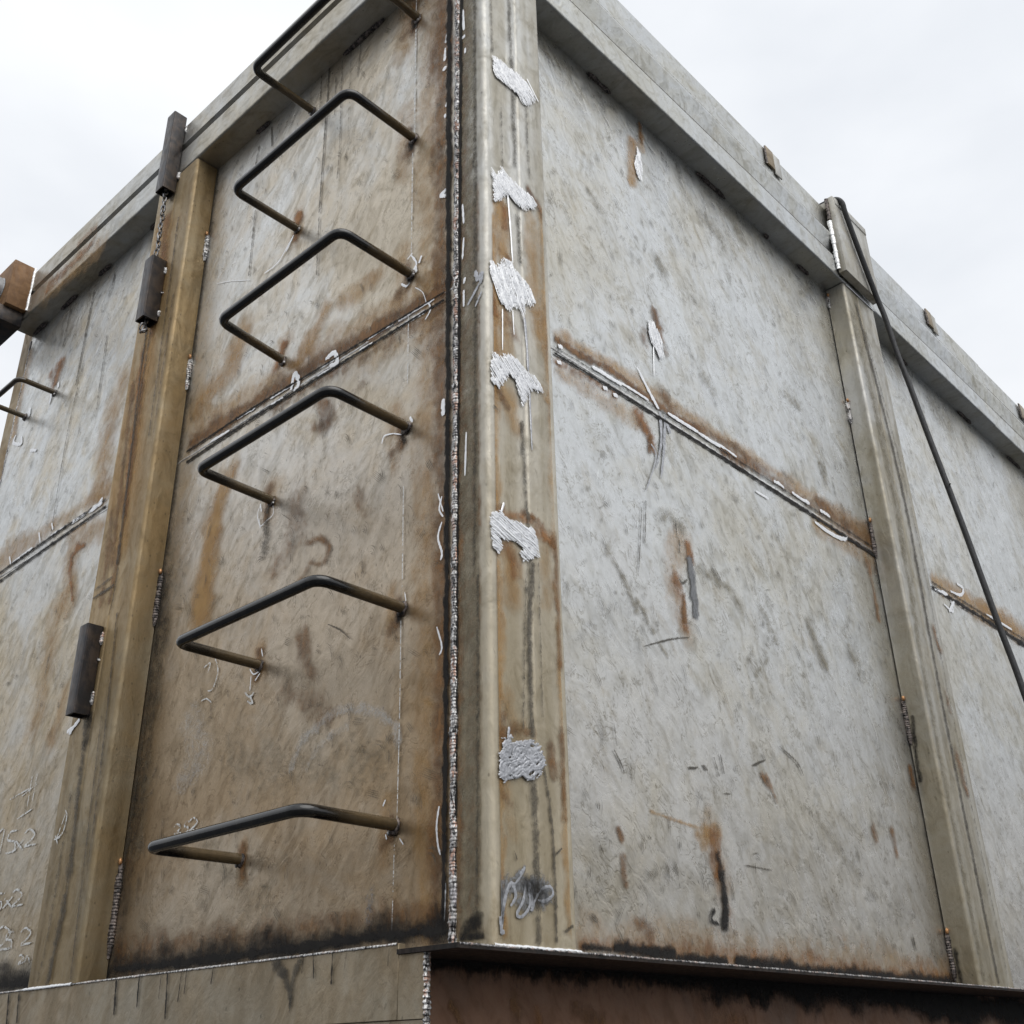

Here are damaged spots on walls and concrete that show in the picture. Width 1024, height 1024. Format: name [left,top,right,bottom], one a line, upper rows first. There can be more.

corrosion [492,201,510,270]
corrosion [493,289,515,357]
corrosion [652,307,663,340]
corrosion [188,282,446,448]
corrosion [555,334,871,544]
corrosion [192,467,236,627]
corrosion [260,484,272,559]
corrosion [309,535,331,565]
corrosion [496,475,563,702]
corrosion [674,573,688,631]
corrosion [685,541,730,588]
corrosion [548,733,566,802]